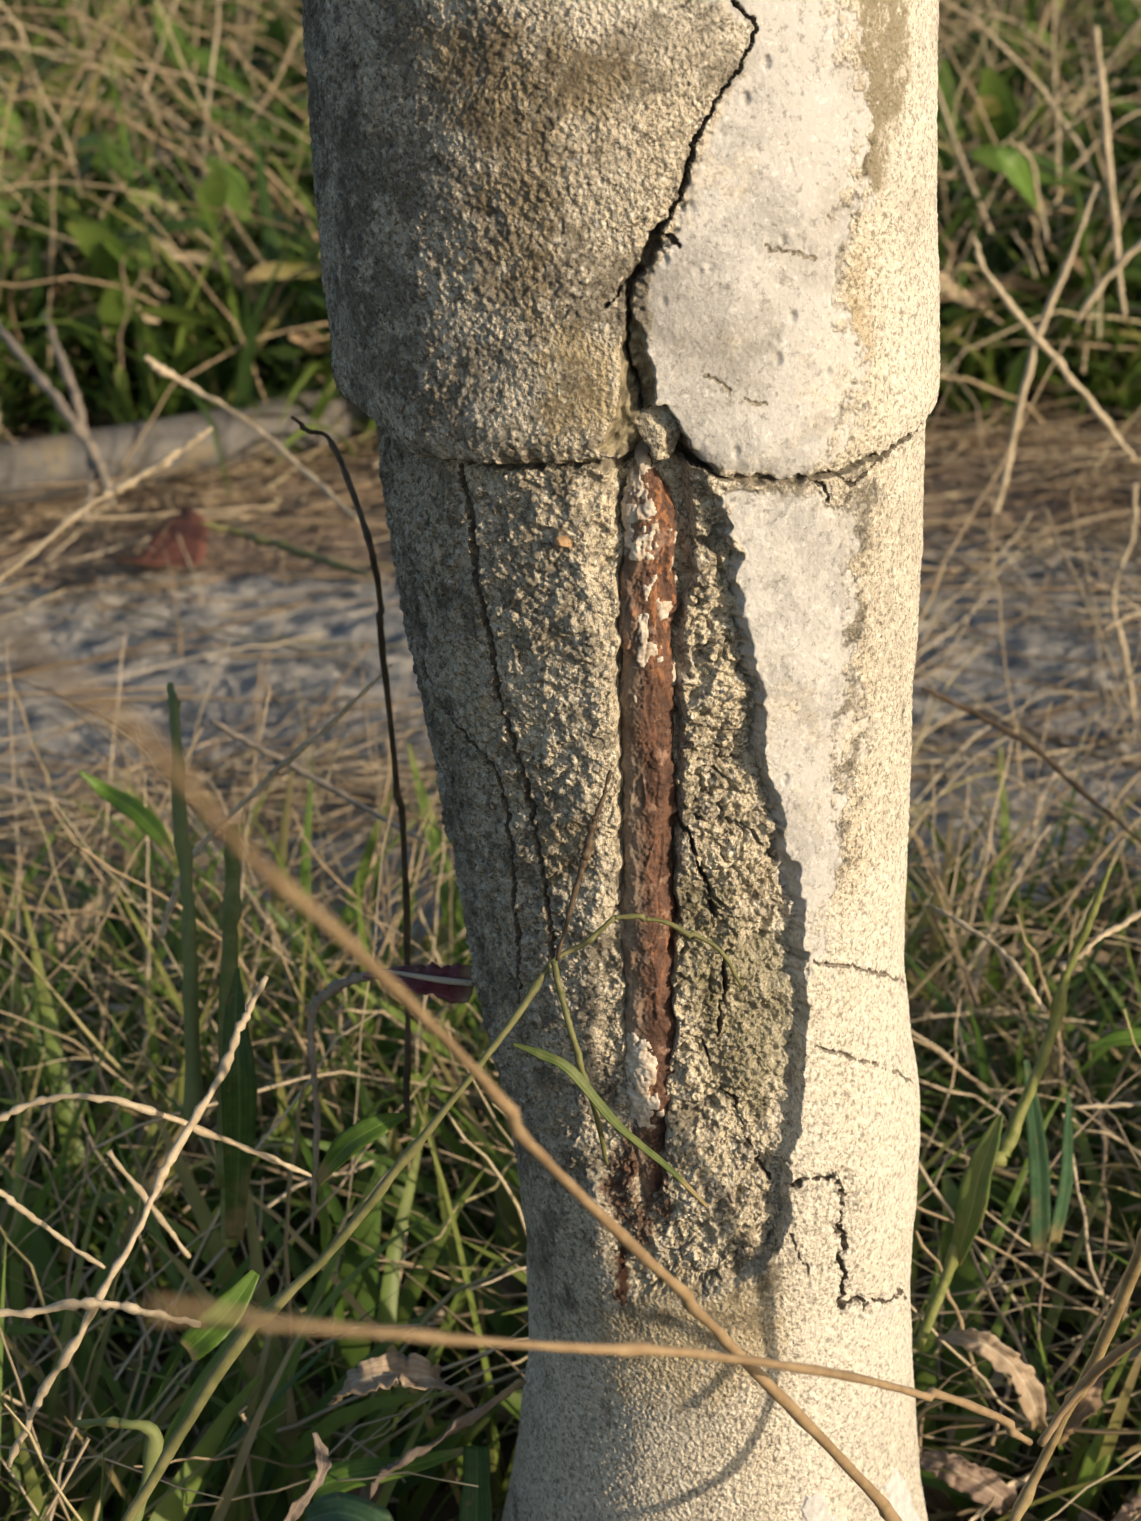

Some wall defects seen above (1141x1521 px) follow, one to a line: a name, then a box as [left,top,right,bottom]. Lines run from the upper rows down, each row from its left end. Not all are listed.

corrosion [593,1114,687,1307]
crack [400,0,922,1004]
peeling [553,0,880,1294]
crack [676,813,914,1311]